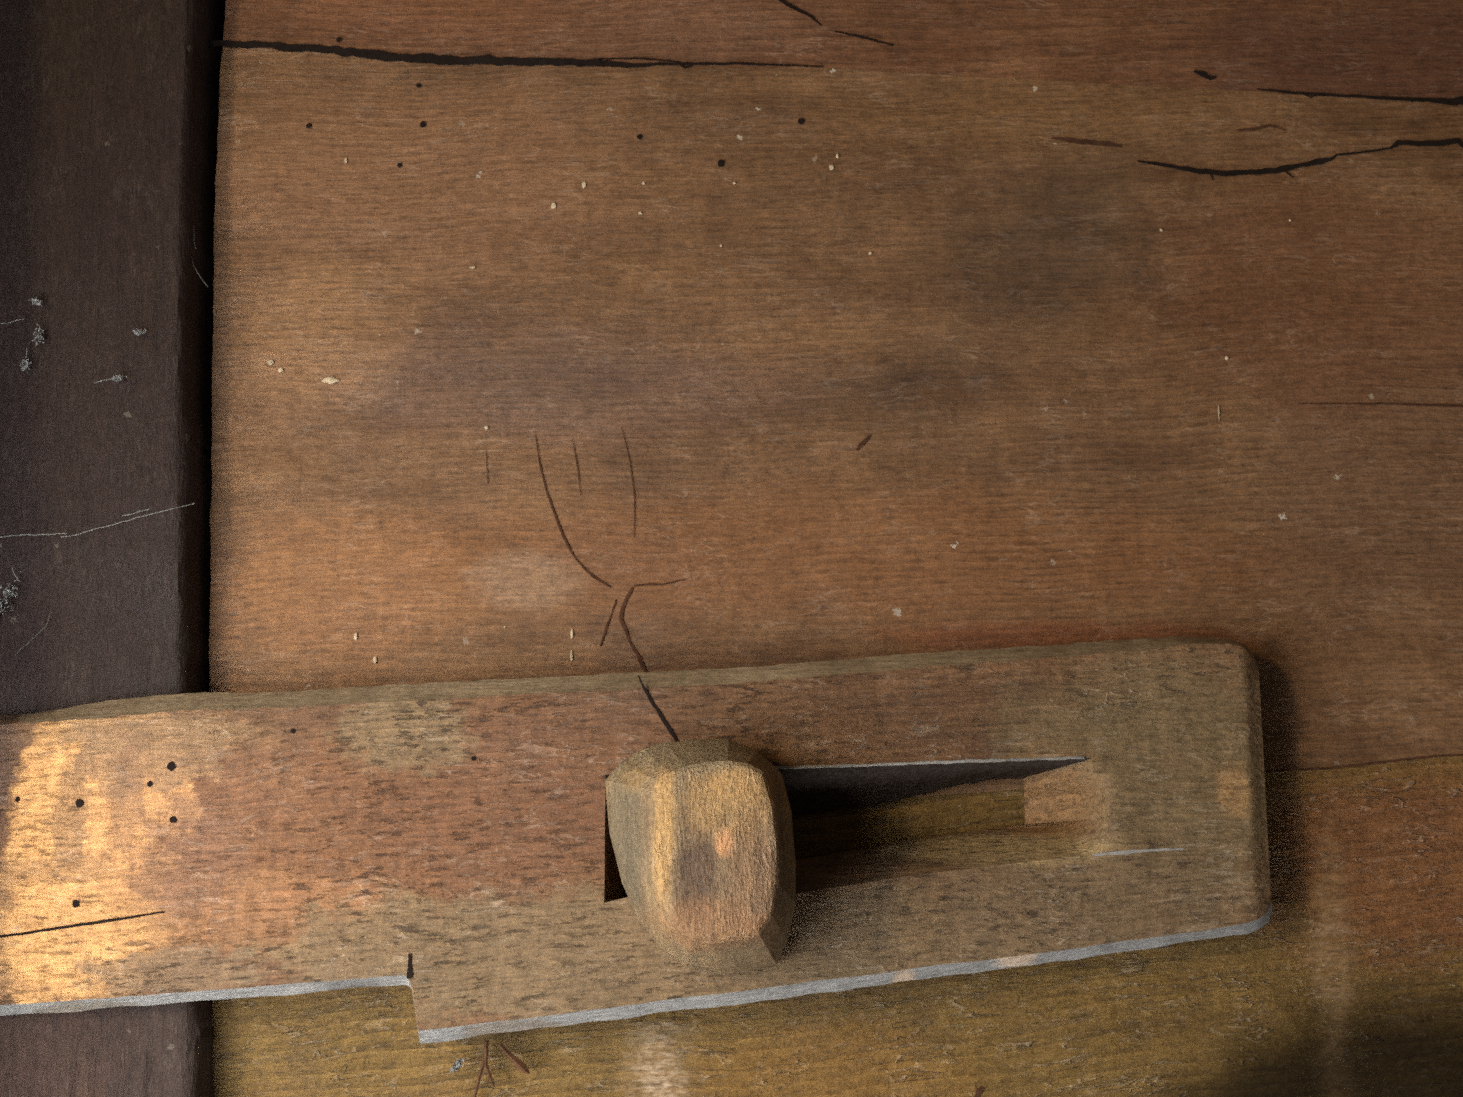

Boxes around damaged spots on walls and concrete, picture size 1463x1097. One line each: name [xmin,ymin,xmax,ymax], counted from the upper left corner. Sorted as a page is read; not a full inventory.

crack [208,40,823,69]
crack [778,0,894,46]
crack [1137,88,1463,180]
crack [535,433,610,588]
crack [621,427,635,525]
crack [638,675,678,741]